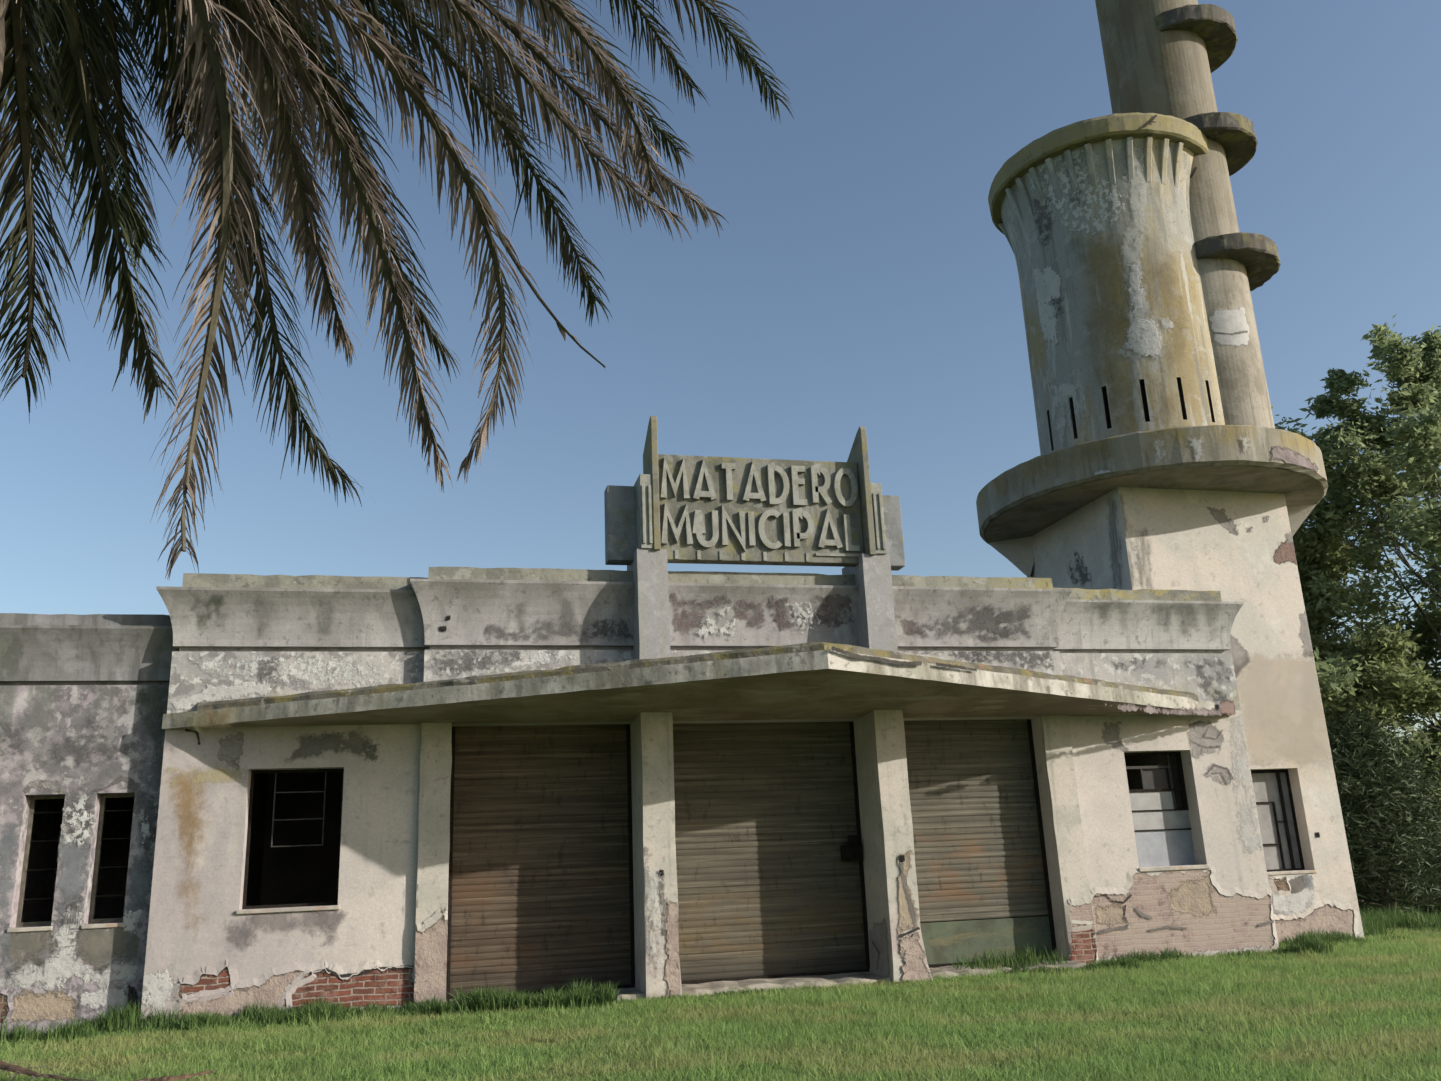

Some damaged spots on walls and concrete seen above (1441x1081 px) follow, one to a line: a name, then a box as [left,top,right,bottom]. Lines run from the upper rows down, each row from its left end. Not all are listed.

peeling [1026,148,1174,362]
peeling [1048,382,1087,432]
peeling [1207,507,1269,536]
flaking render [1273,531,1297,565]
peeling [1102,700,1236,785]
peeling [61,788,95,847]
peeling [134,791,159,863]
flaking render [0,884,448,1032]
spalling [869,846,932,982]
flaking render [1064,866,1360,965]